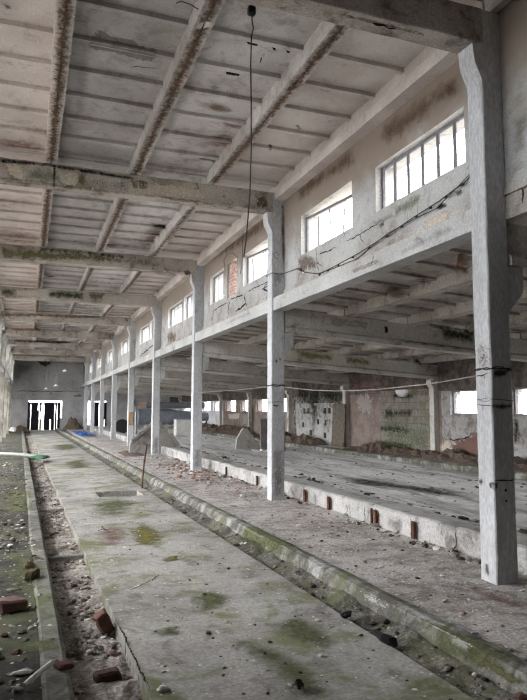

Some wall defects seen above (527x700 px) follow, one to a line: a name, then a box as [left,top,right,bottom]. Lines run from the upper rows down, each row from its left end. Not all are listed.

water stain [0,0,221,257]
water stain [386,81,455,140]
crack [213,282,268,316]
flaking render [440,429,478,455]
crack [118,624,150,687]